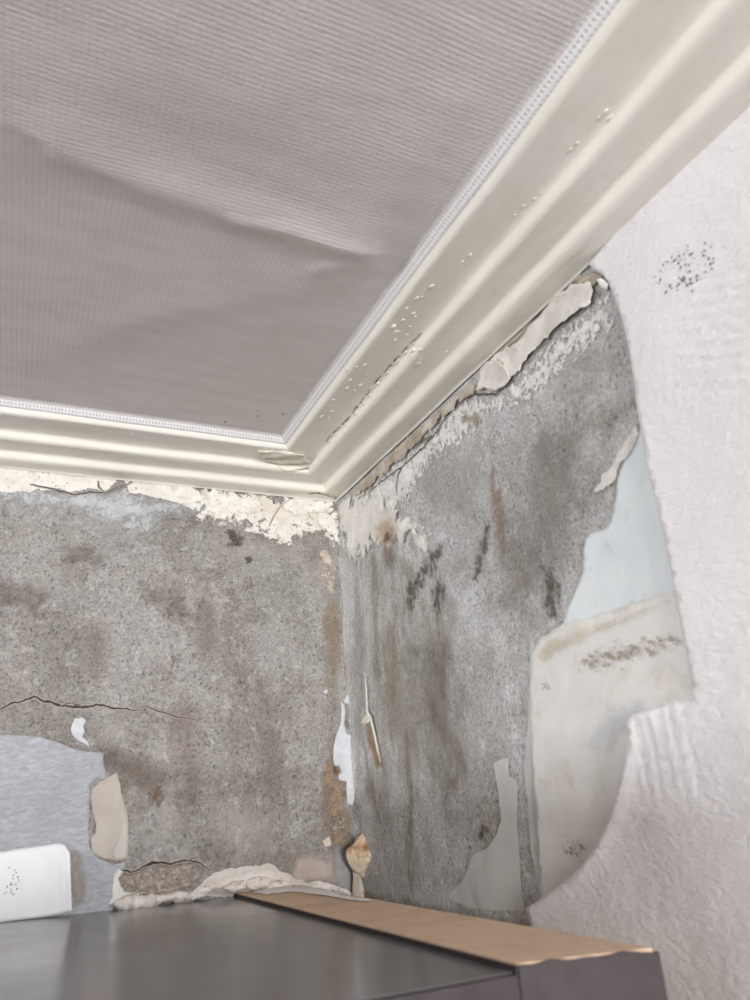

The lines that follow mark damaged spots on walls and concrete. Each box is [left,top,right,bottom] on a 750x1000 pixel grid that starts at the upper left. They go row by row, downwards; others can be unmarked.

damp [654,242,714,294]
peeling [352,272,608,495]
crack [30,481,132,496]
peeling [0,468,340,561]
damp [407,545,445,612]
damp [472,526,489,580]
damp [545,568,560,617]
damp [578,635,680,673]
crack [0,694,198,721]
peeling [349,678,381,766]
flaking render [120,863,204,894]
crack [122,856,210,874]